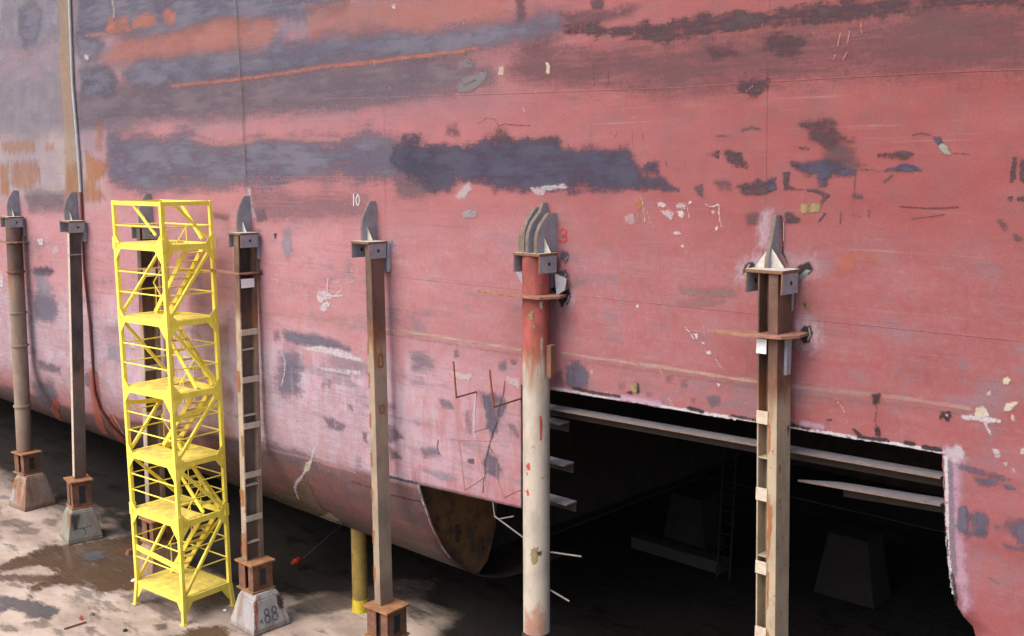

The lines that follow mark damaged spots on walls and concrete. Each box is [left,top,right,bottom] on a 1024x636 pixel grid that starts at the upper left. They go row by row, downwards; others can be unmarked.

peeling [76,0,1024,97]
peeling [106,126,680,195]
peeling [711,119,856,223]